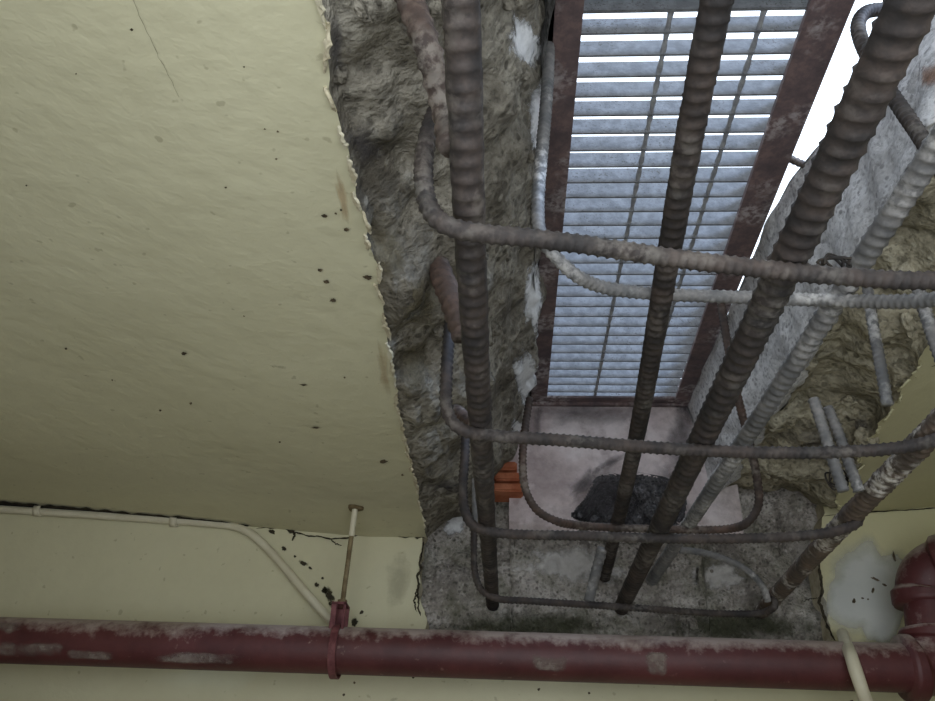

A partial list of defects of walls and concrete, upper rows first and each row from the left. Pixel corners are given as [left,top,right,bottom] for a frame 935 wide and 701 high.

corrosion [922,67,935,82]
spalling [314,0,935,641]
crack [0,501,358,546]